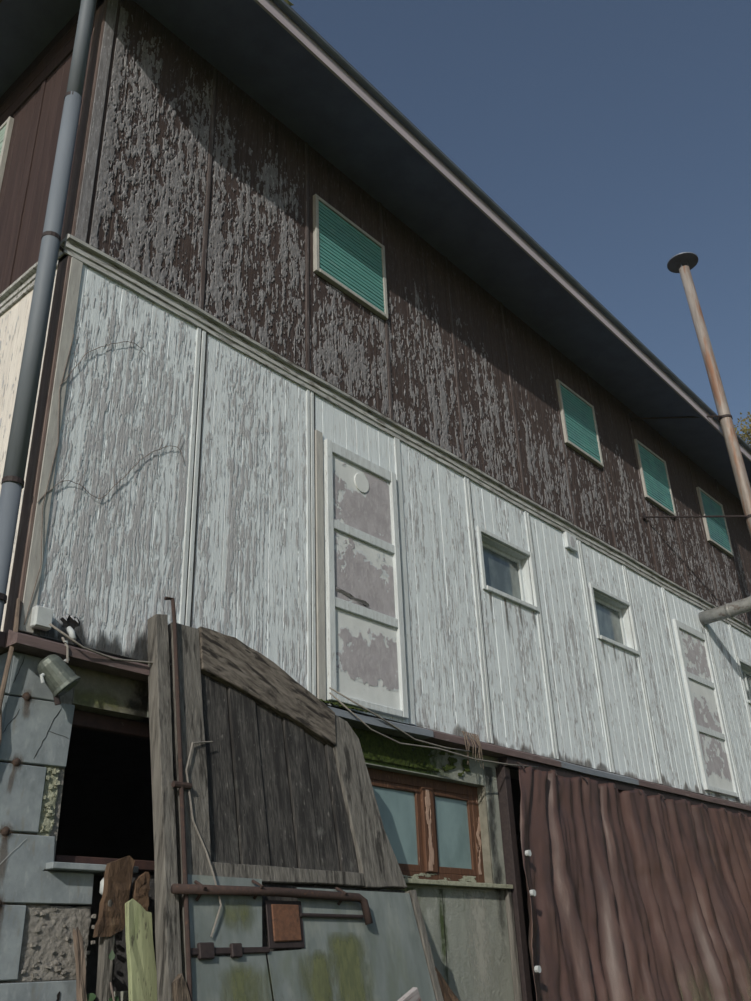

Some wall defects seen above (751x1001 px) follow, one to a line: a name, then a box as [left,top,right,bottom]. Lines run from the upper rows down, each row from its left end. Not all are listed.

peeling [38,274,307,689]
peeling [336,627,399,692]
peeling [89,6,751,618]
peeling [402,445,751,803]
damp [521,748,634,778]
damp [305,936,367,1001]